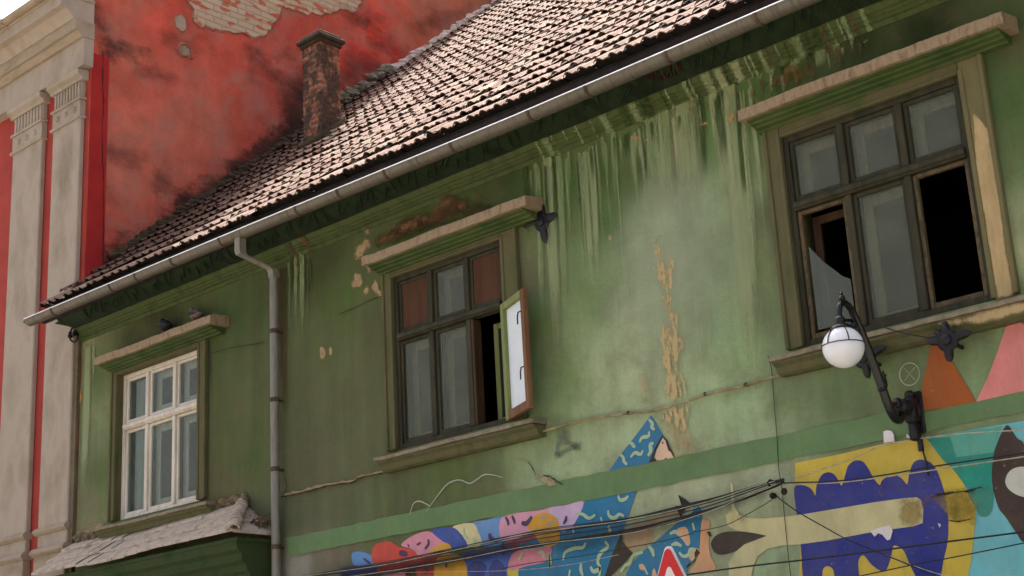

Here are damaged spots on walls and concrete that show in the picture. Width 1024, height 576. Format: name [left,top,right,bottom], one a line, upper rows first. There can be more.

spalling [173,0,365,60]
damp [523,9,870,322]
spalling [351,229,381,298]
spalling [319,346,333,360]
peeling [655,244,688,447]